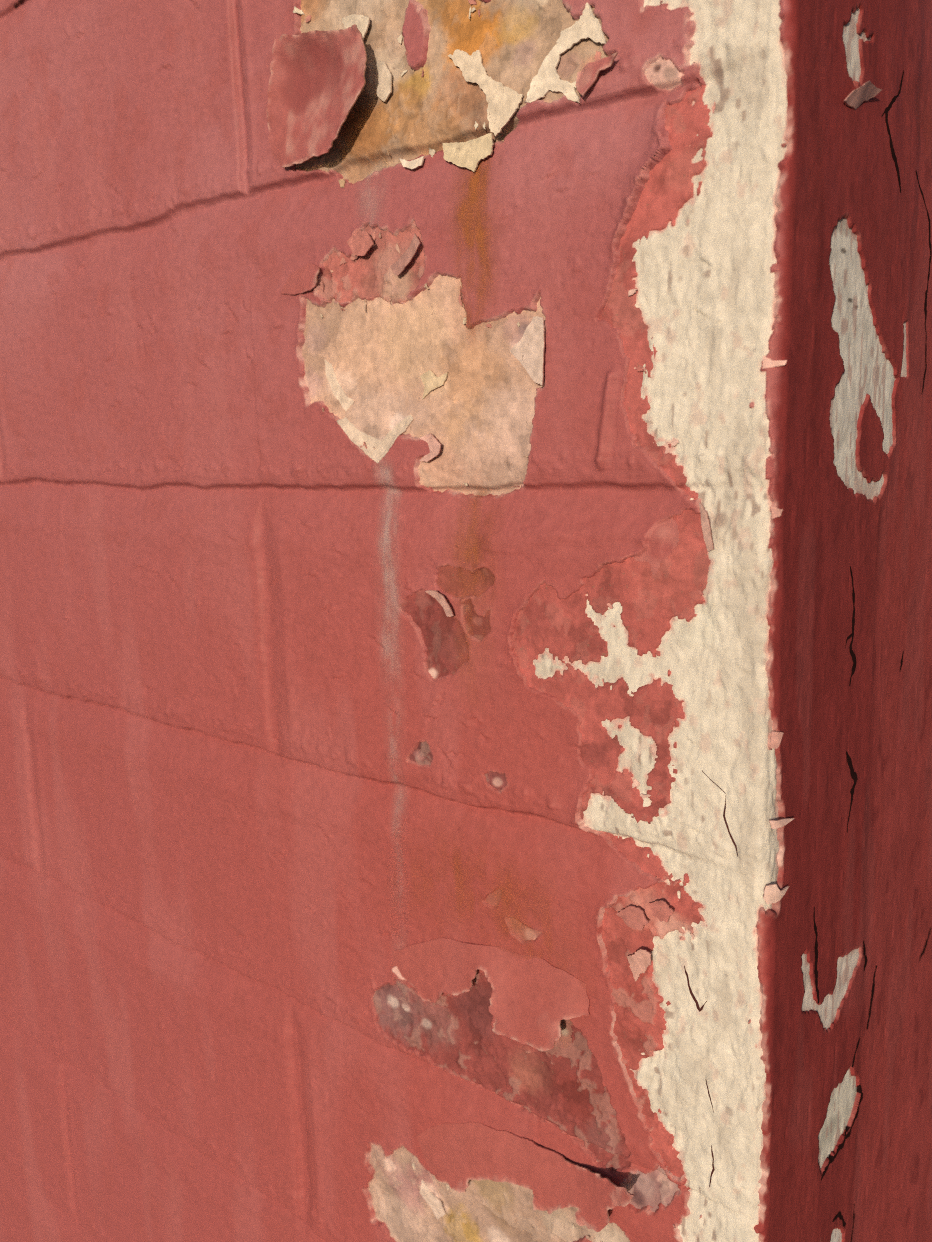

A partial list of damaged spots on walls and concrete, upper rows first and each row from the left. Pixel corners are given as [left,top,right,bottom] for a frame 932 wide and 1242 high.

peeling [266,0,618,188]
peeling [842,8,882,110]
crack [882,70,932,393]
peeling [280,221,546,496]
peeling [830,218,907,500]
peeling [368,0,795,1242]
crack [845,566,856,686]
peeling [801,948,859,1030]
peeling [818,1069,857,1170]
peeling [830,1228,842,1242]